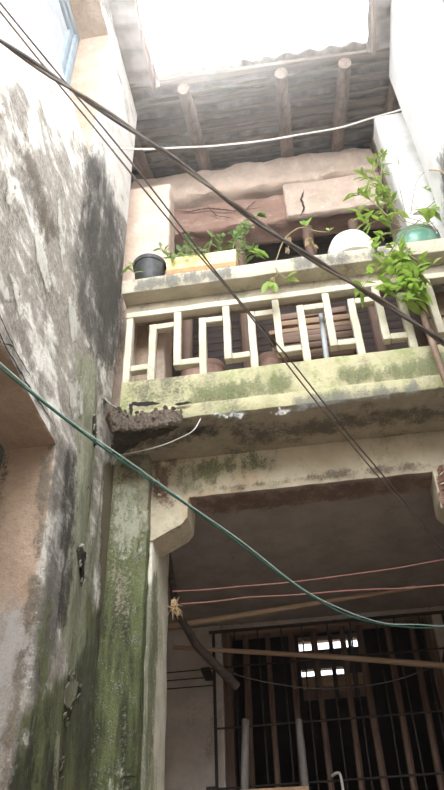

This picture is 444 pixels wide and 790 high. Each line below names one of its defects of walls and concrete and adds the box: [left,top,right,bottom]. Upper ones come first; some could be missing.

water stain [15,134,59,242]
crack [174,201,260,218]
peeling [68,376,83,422]
spalling [104,398,184,457]
water stain [177,405,444,492]
water stain [186,352,444,408]
spalling [436,462,444,509]
spalling [77,543,87,587]
water stain [98,462,147,659]
water stain [0,441,77,790]
spalling [62,669,83,726]
water stain [134,572,159,790]